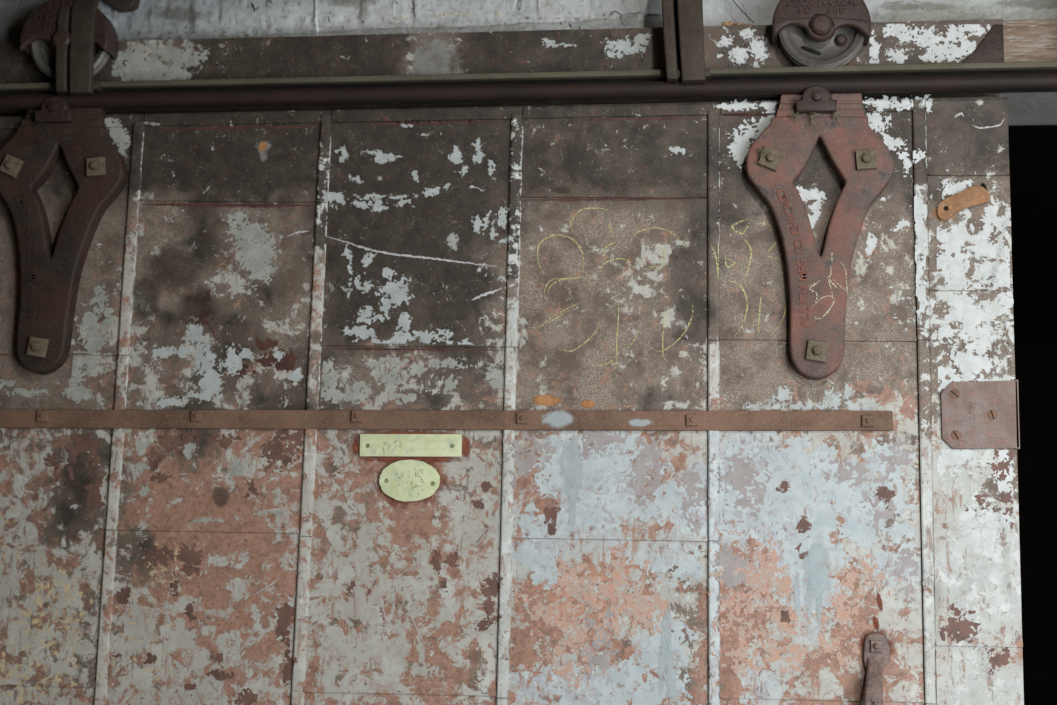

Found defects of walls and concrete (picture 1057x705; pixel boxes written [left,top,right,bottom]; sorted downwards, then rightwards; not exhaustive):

peeling [715,28,770,68]
peeling [869,24,991,64]
peeling [334,145,402,164]
peeling [317,170,451,212]
peeling [448,137,496,192]
peeling [471,201,514,244]
peeling [713,99,780,171]
peeling [796,185,827,229]
peeling [321,244,491,405]
peeling [937,449,1014,553]
corrosion [859,592,893,654]
peeling [939,603,1015,675]